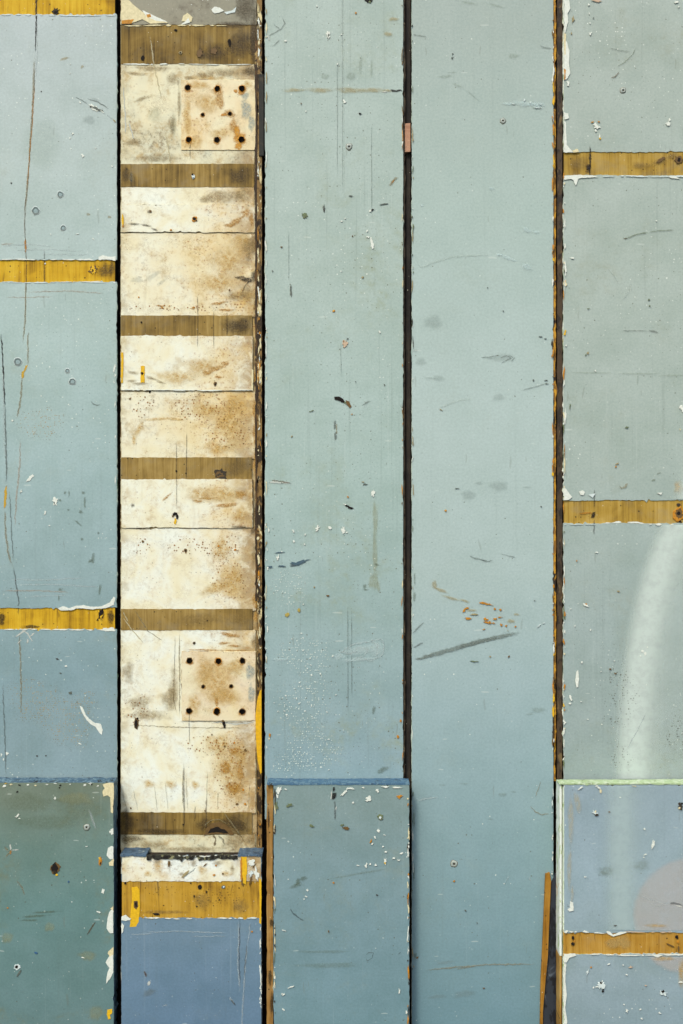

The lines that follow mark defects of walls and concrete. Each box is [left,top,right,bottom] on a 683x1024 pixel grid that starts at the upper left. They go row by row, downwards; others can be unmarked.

peeling [4,0,236,31]
spalling [126,4,267,103]
corrosion [184,77,245,149]
peeling [524,0,683,190]
corrosion [172,396,256,450]
peeling [4,597,116,631]
corrosion [174,536,257,620]
corrosion [463,602,517,631]
corrosion [186,633,246,711]
spalling [552,661,583,748]
corrosion [186,734,247,805]
peeling [106,948,114,983]